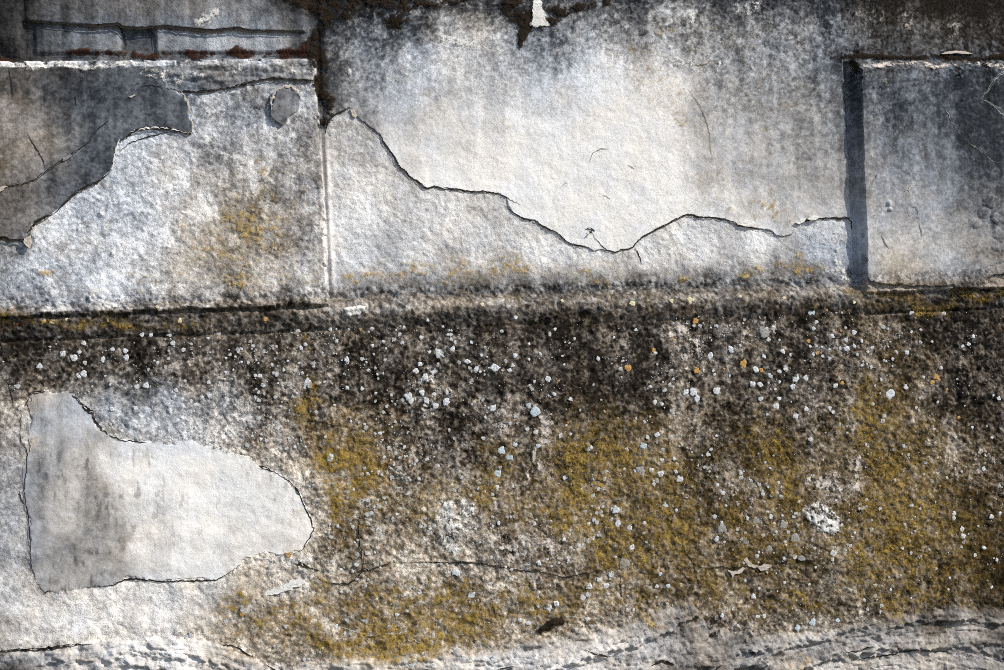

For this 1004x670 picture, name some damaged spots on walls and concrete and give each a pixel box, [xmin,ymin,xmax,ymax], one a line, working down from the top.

flaking render [0,3,1004,293]
water stain [305,0,1004,228]
water stain [441,257,785,298]
water stain [802,231,852,284]
flaking render [22,389,315,595]
water stain [0,300,864,491]
water stain [422,499,557,598]
water stain [805,456,862,505]